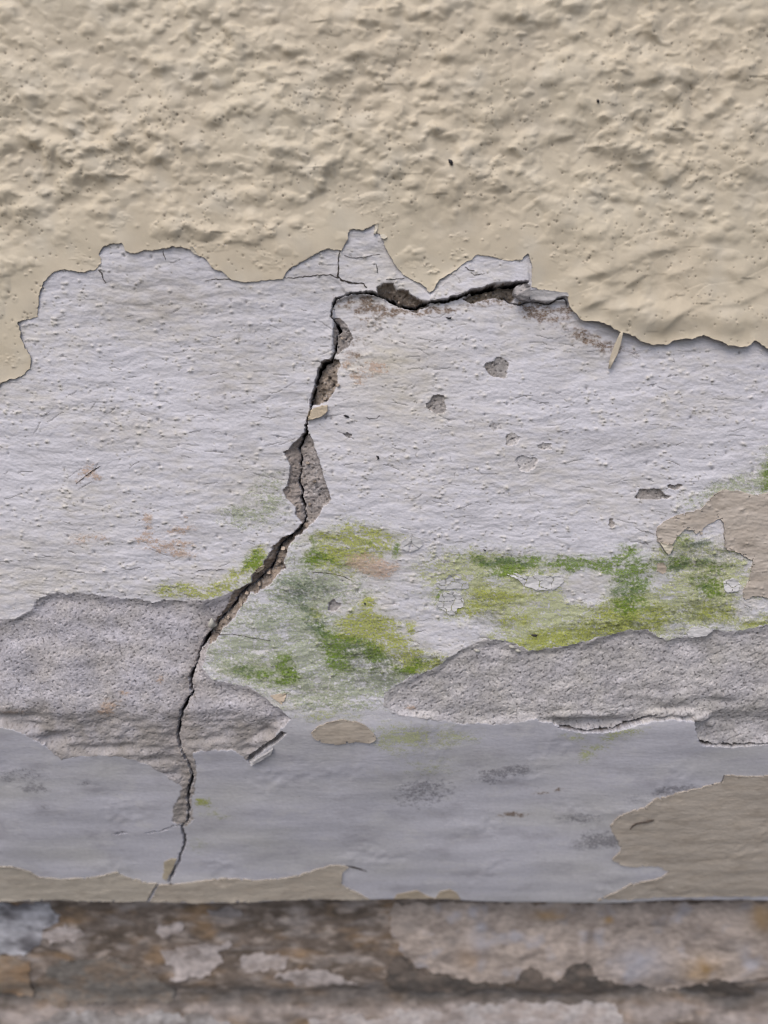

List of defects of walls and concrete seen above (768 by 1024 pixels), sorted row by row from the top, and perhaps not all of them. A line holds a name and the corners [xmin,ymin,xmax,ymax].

crack [111,252,569,902]
peeling [0,224,768,826]